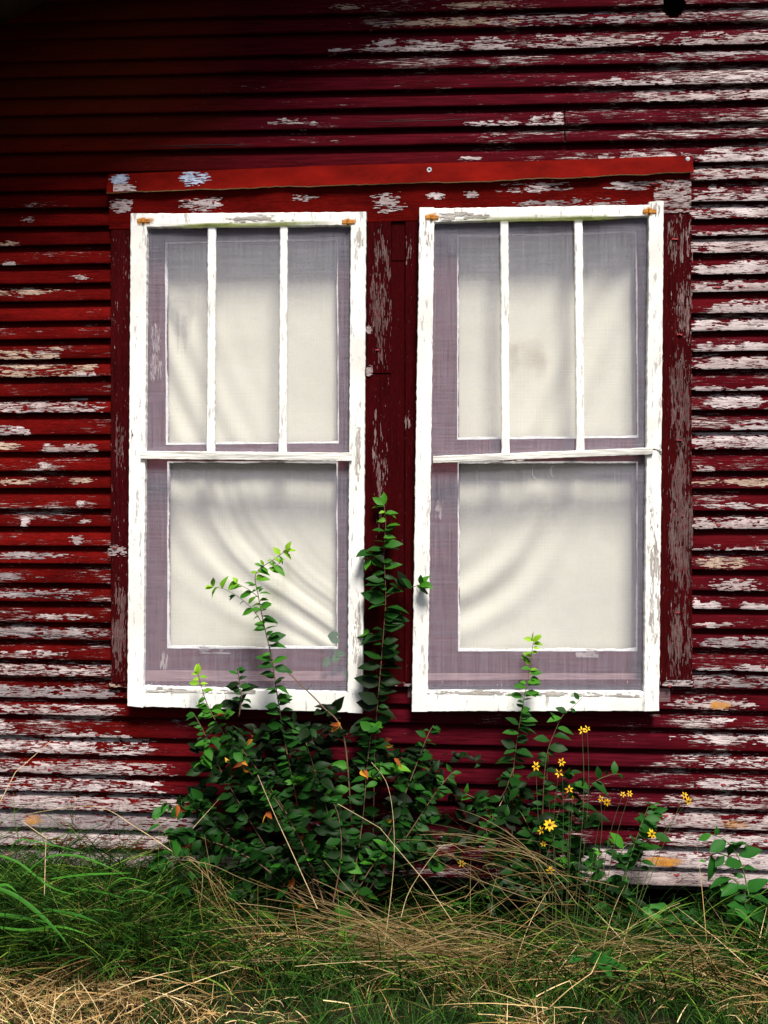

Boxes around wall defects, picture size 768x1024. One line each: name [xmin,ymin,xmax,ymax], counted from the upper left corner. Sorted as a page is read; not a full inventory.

peeling [364,1,768,58]
peeling [602,71,768,116]
peeling [463,112,564,137]
peeling [109,174,137,213]
peeling [178,172,223,212]
peeling [370,193,408,213]
peeling [0,287,70,297]
peeling [0,347,98,377]
peeling [0,398,126,471]
peeling [0,443,98,486]
peeling [0,500,91,559]
peeling [495,146,768,888]